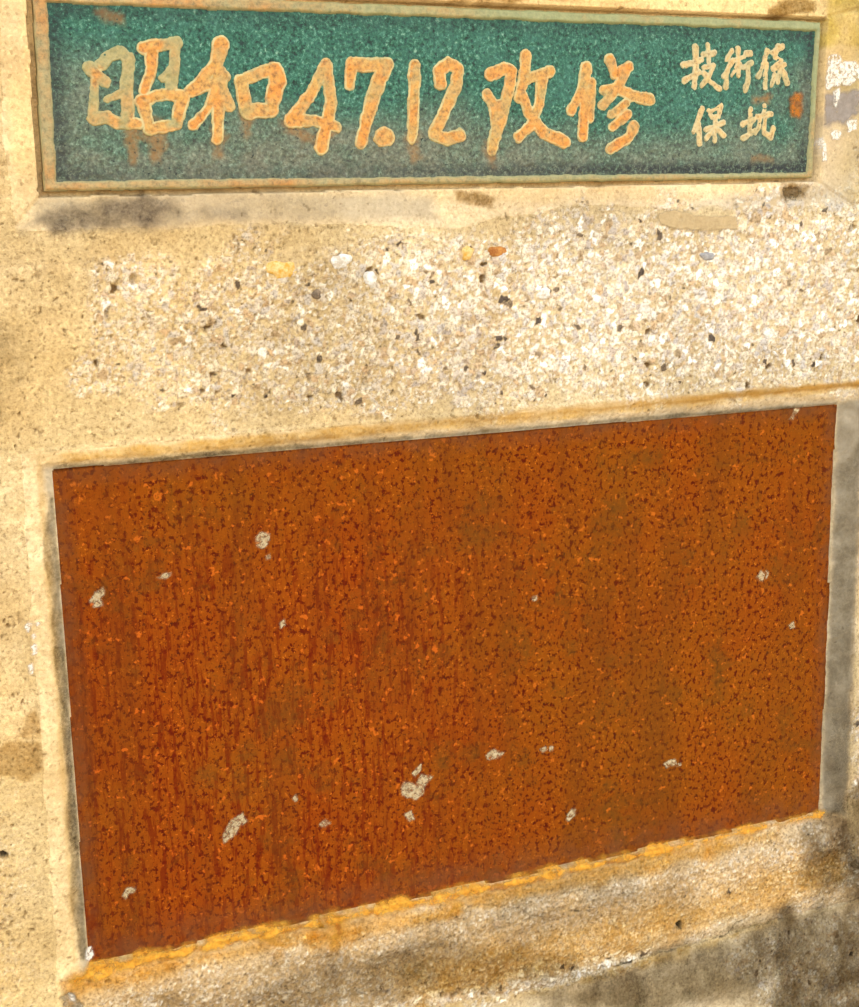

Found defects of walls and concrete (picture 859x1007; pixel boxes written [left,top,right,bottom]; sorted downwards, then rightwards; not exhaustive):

rust [789,811,825,822]
rust [73,823,768,983]